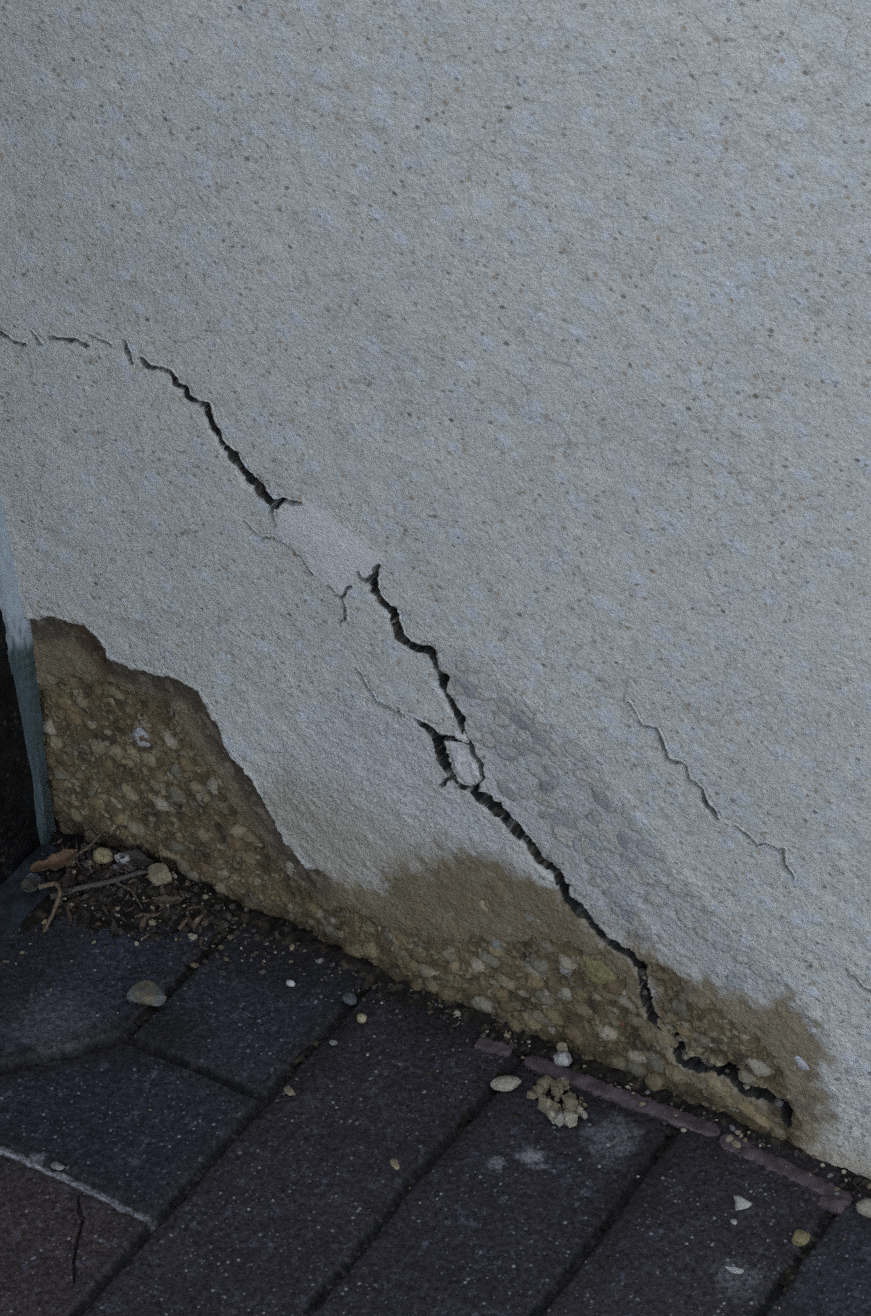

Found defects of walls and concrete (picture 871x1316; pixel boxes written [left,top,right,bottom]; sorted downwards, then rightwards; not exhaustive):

crack [0,328,797,1132]
spalling [39,626,802,1149]
leakage [24,612,861,1168]
spalling [795,1056,810,1070]